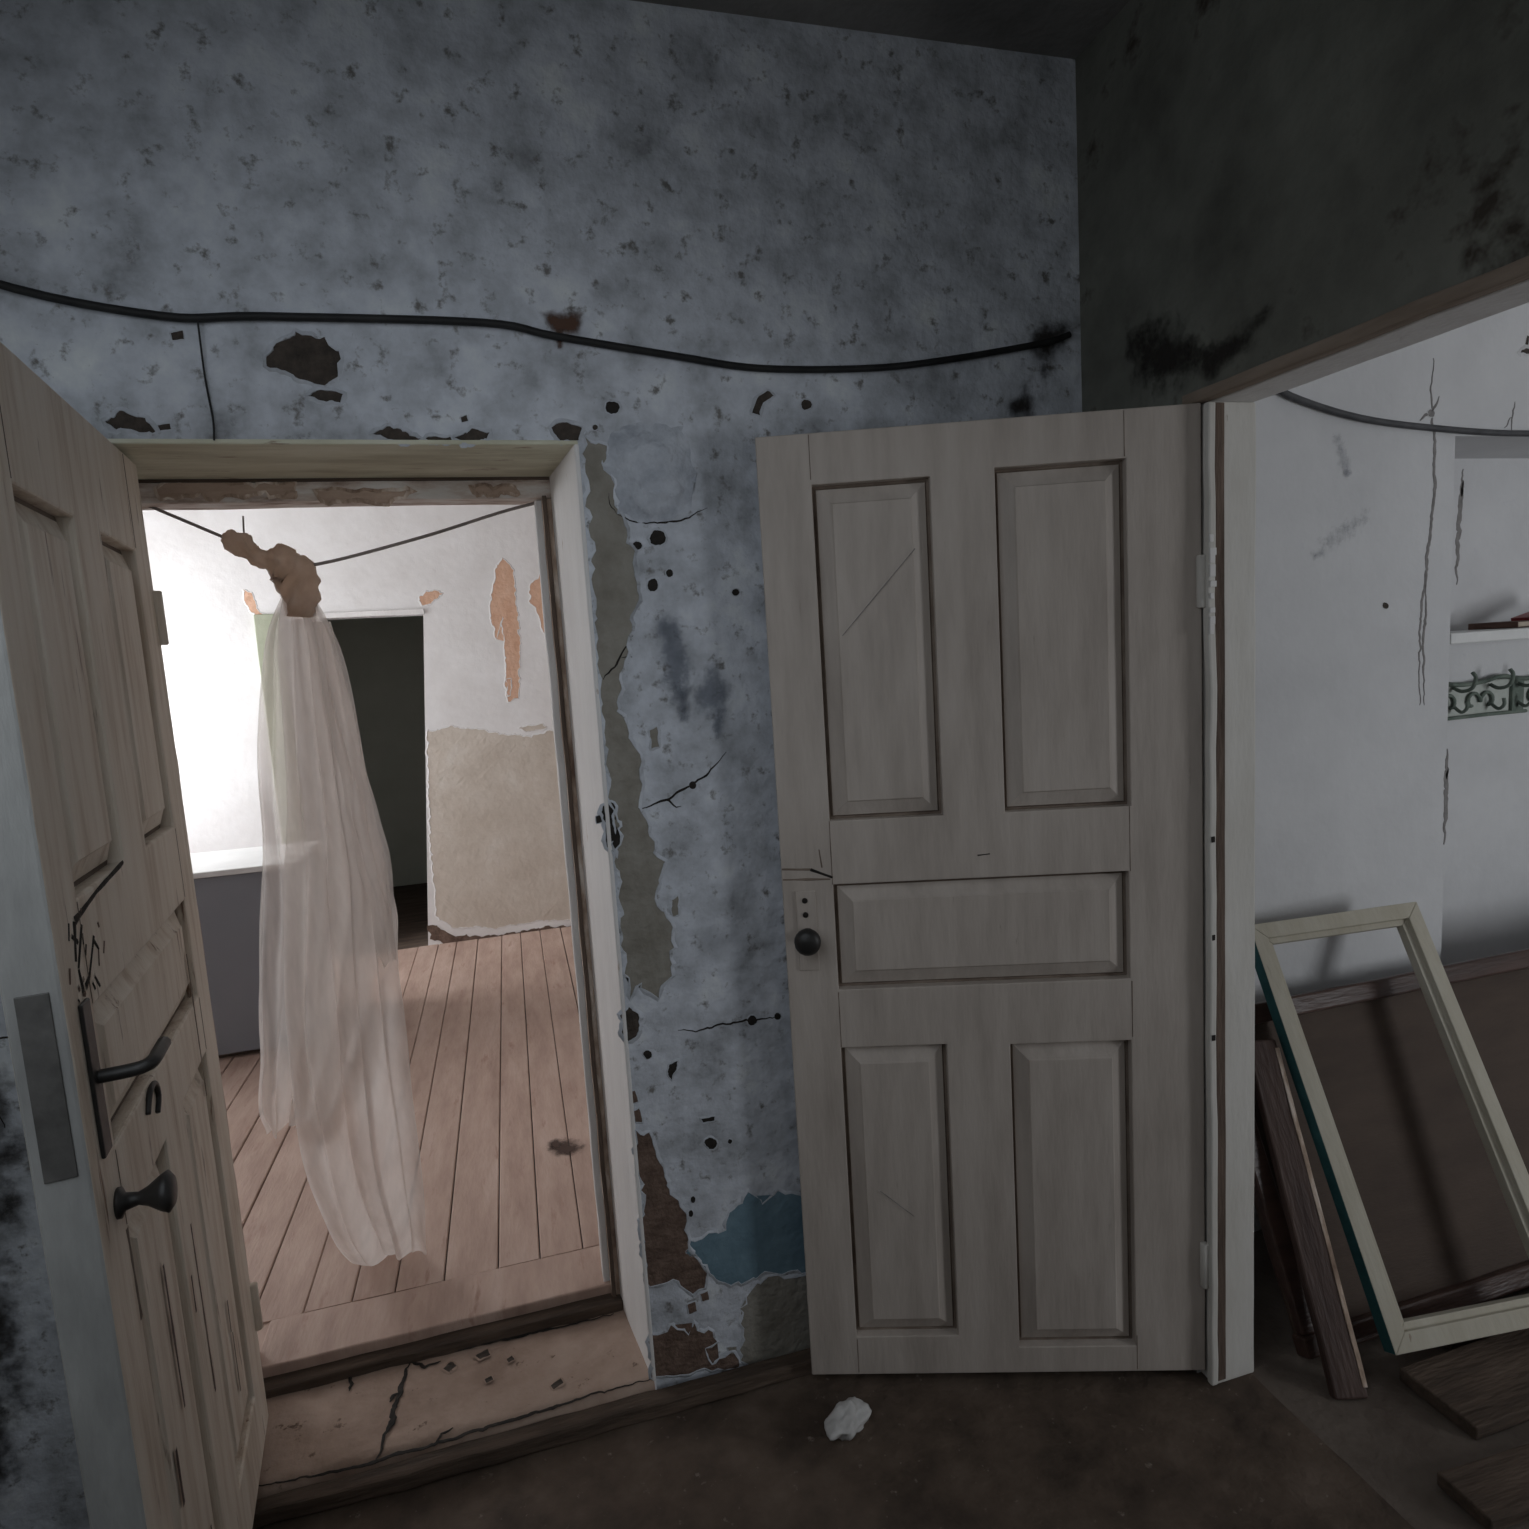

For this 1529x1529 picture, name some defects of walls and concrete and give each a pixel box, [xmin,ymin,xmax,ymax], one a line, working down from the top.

spalling [169,330,185,342]
spalling [263,328,347,406]
crack [1418,358,1464,705]
peeling [488,557,545,703]
peeling [549,400,681,1082]
crack [642,752,726,809]
spalling [631,1089,810,1380]
crack [259,1313,650,1486]